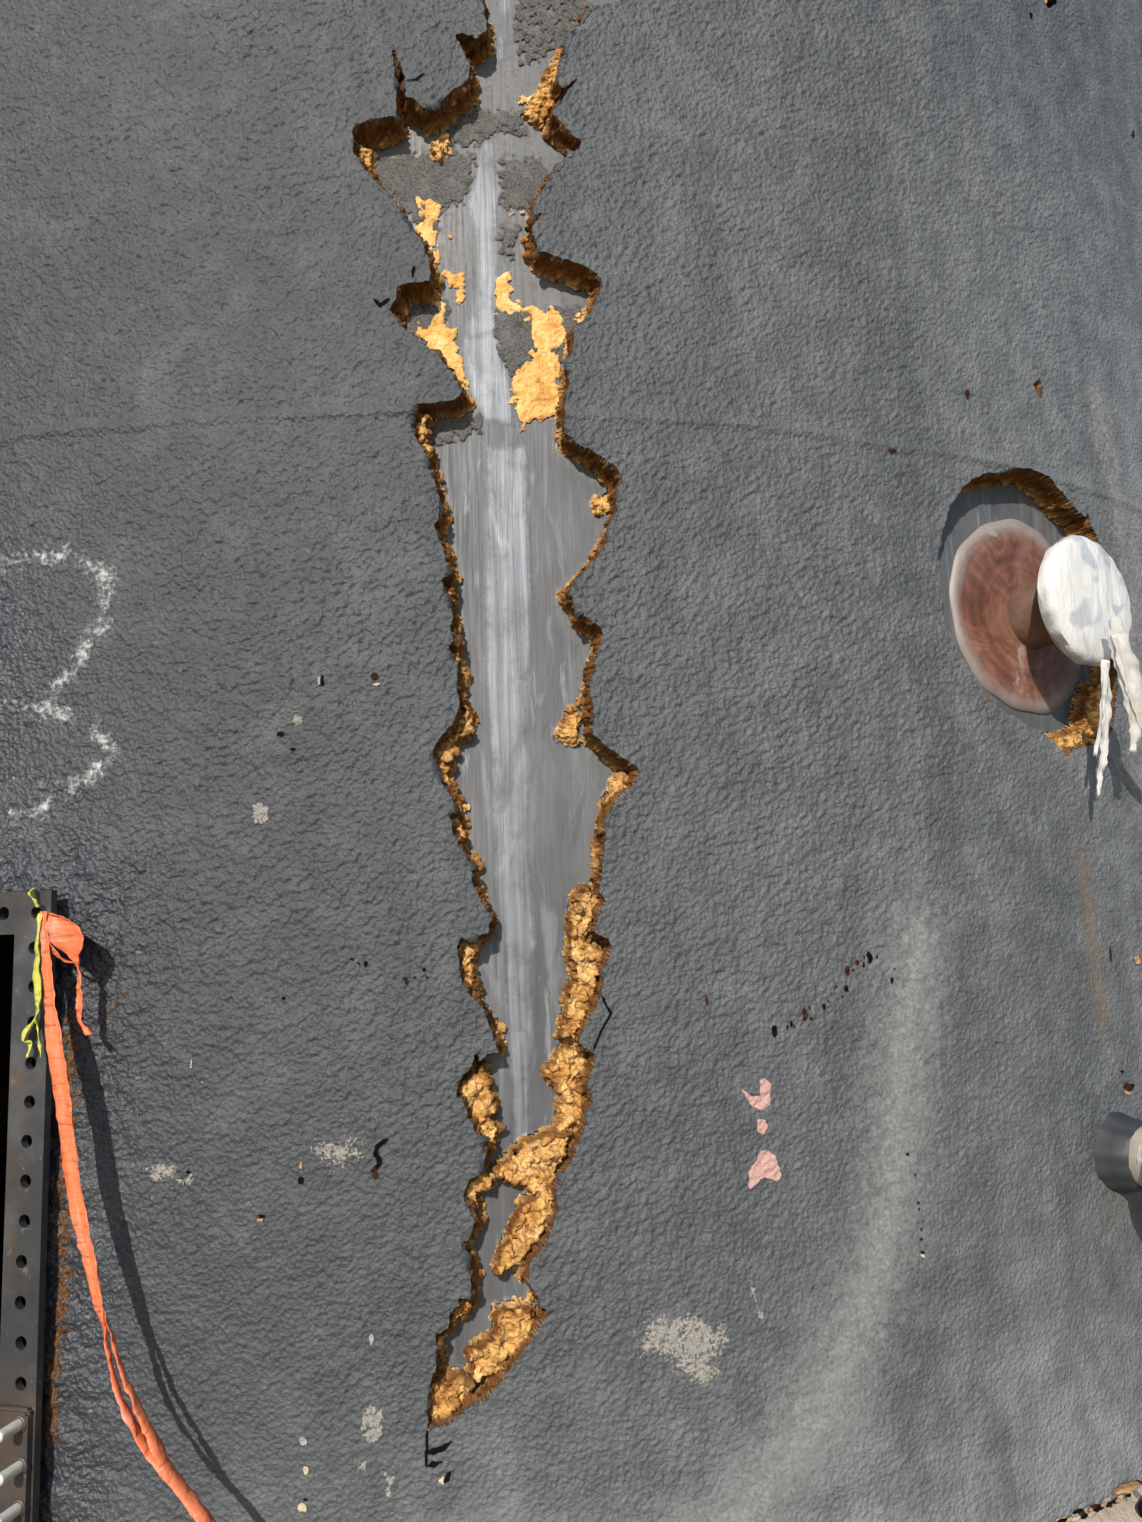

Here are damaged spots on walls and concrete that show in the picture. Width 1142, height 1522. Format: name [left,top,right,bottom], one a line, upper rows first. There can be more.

spalling [371,0,621,1369]
spalling [938,468,1119,757]